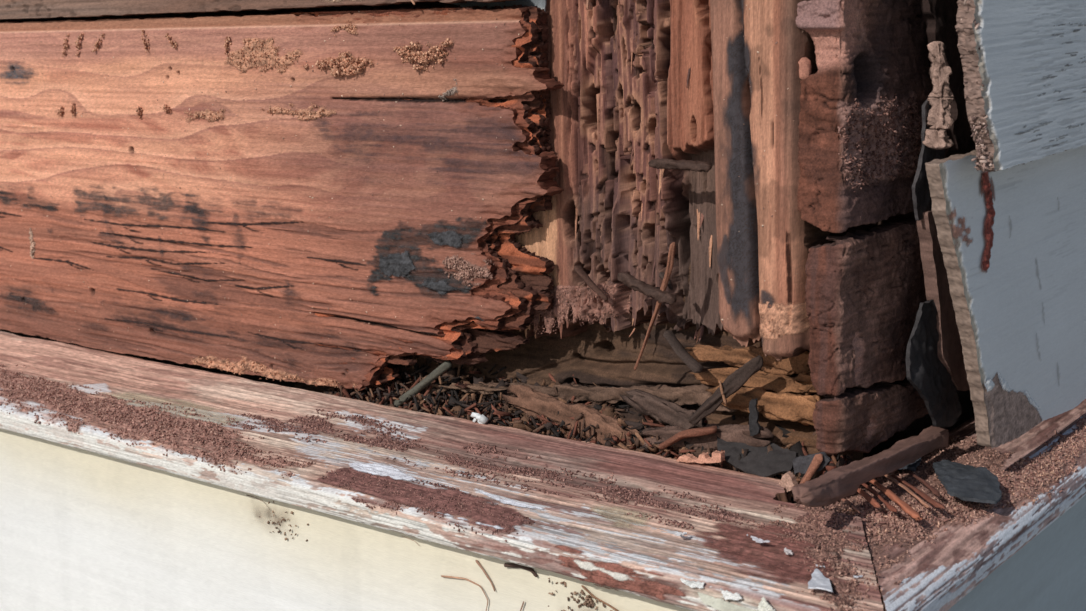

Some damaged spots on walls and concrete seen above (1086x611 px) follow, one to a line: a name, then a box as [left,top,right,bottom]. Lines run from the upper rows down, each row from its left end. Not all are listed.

crack [334,96,486,104]
leakage [718,0,773,320]
leakage [0,191,58,211]
leakage [74,187,216,243]
rust [948,171,995,272]
peeling [471,412,489,424]
peeling [982,373,1042,448]
peeling [317,462,543,530]
peeling [554,545,776,611]
peeling [674,523,835,592]